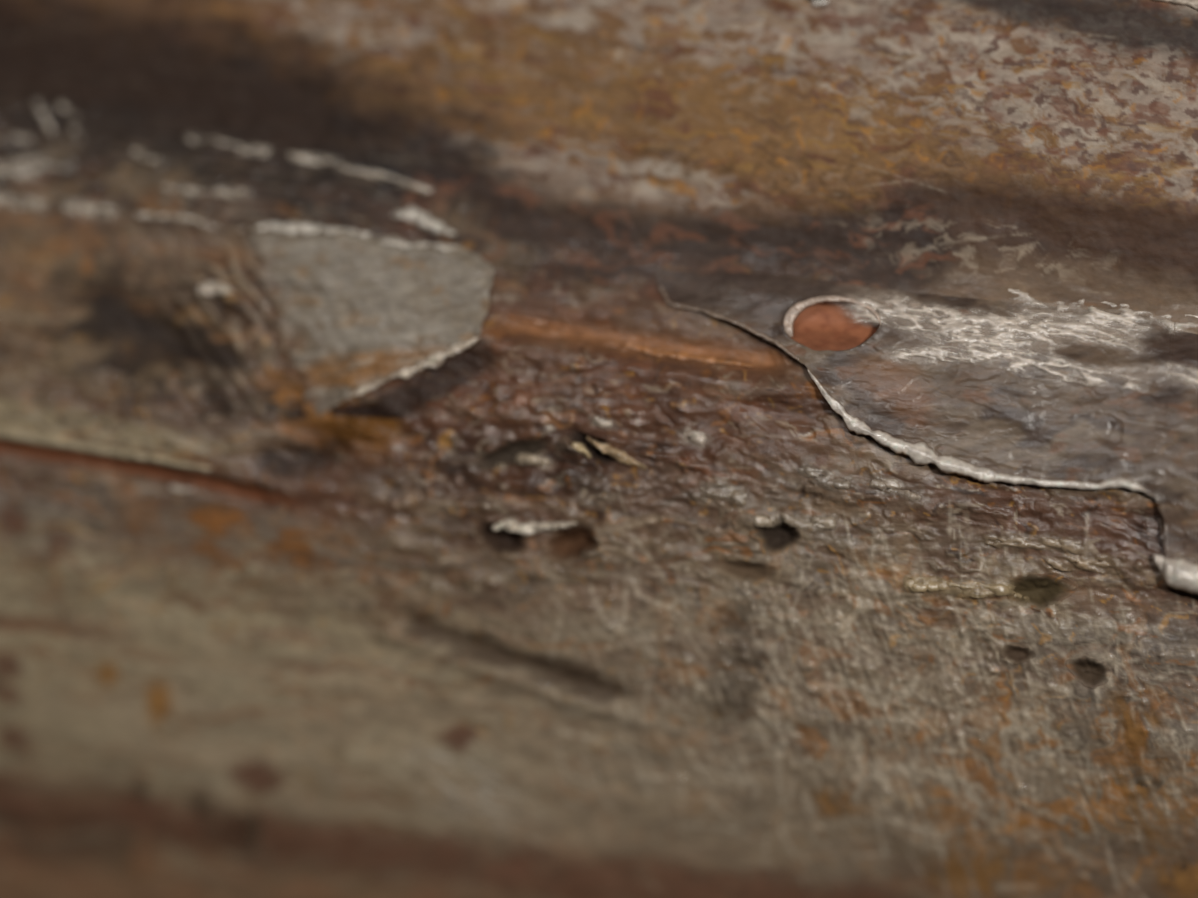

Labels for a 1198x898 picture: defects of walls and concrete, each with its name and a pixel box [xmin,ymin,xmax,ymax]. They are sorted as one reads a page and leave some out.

peeling [237,220,495,416]
spalling [474,425,620,471]
spalling [711,522,803,584]
spalling [1005,572,1078,612]